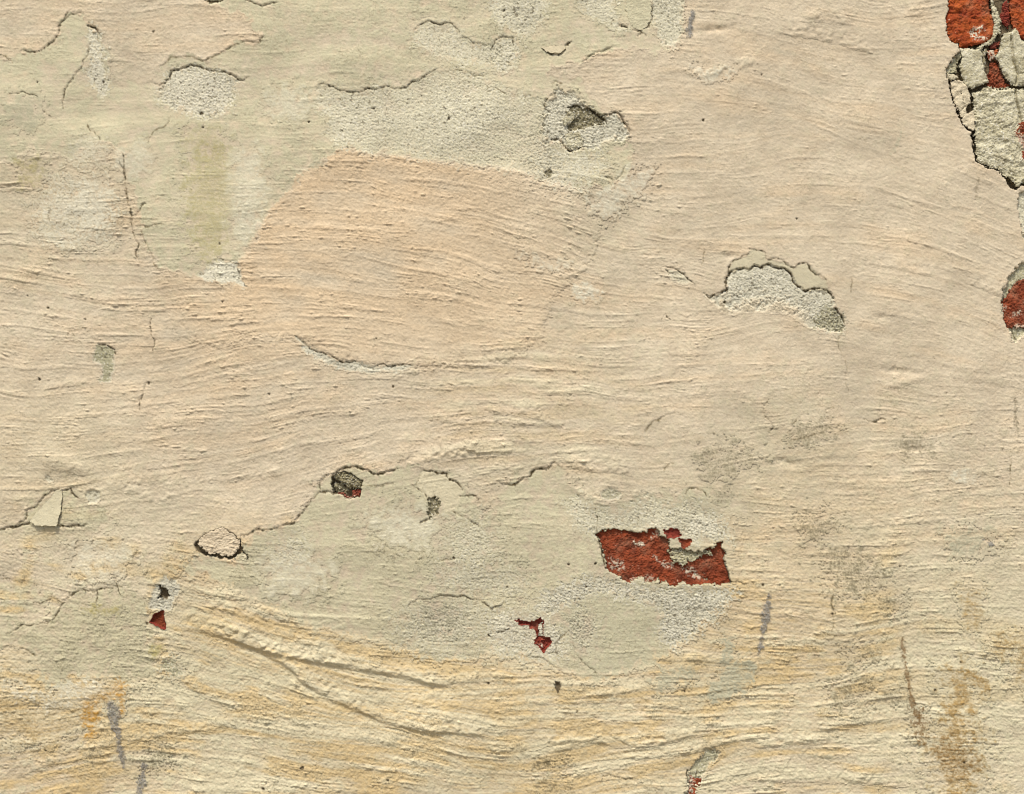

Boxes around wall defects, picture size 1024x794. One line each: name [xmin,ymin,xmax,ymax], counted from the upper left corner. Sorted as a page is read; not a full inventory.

crack [0,14,98,116]
peeling [0,0,687,291]
spalling [945,0,1024,239]
spalling [660,247,852,339]
spalling [1000,262,1024,343]
crack [0,488,84,530]
crack [243,466,398,536]
crack [417,471,479,525]
peeling [0,458,755,693]